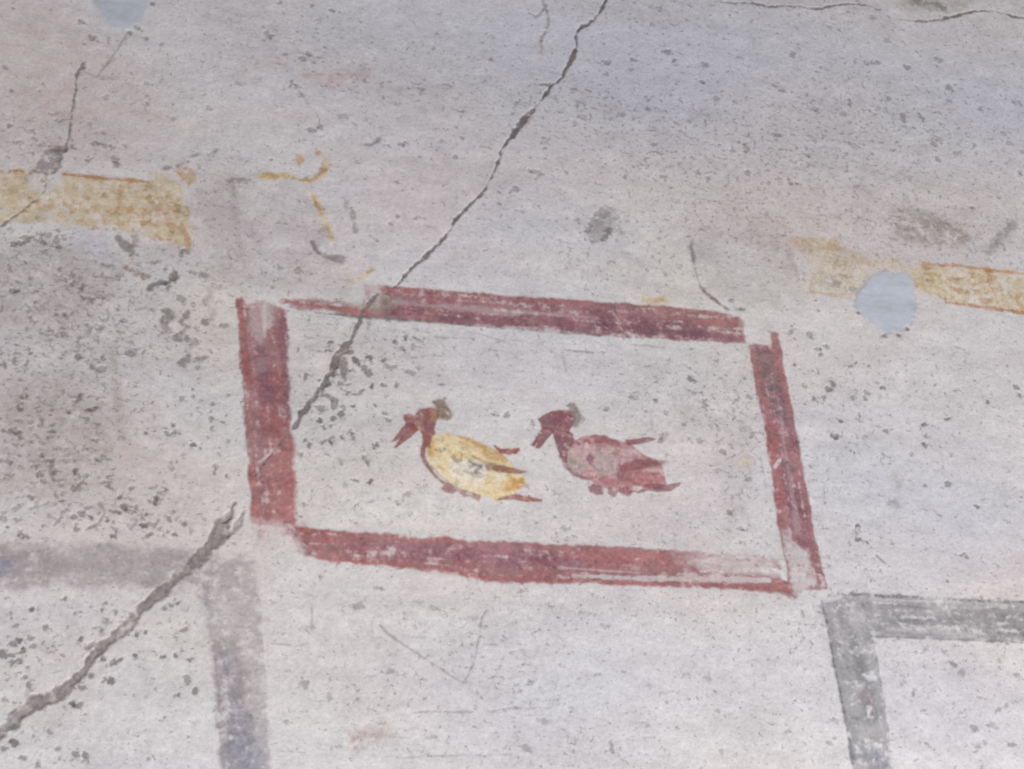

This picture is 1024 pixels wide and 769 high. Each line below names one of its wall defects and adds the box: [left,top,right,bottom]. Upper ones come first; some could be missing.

crack [0,181,48,228]
crack [57,32,129,153]
crack [251,0,609,477]
crack [0,499,246,742]